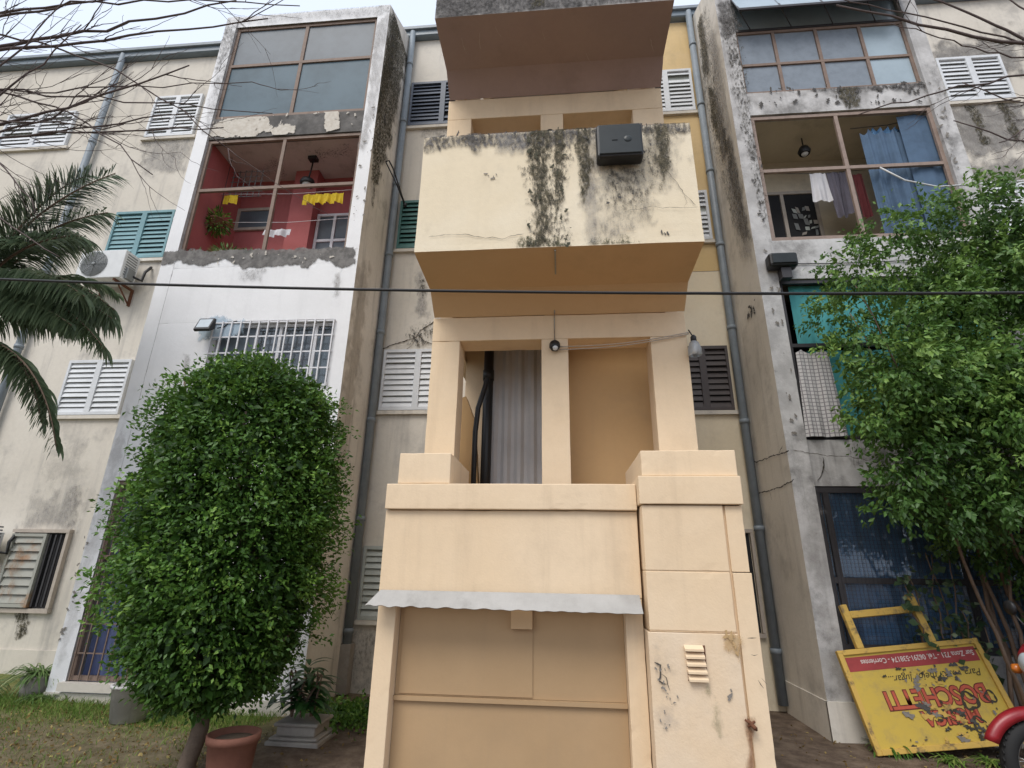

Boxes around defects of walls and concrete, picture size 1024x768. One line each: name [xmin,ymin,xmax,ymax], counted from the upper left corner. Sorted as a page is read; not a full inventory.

peeling [209,113,296,138]
peeling [313,111,356,132]
damp [316,10,407,206]
damp [697,12,750,250]
damp [522,123,677,247]
crack [754,448,868,495]
crack [655,662,670,694]